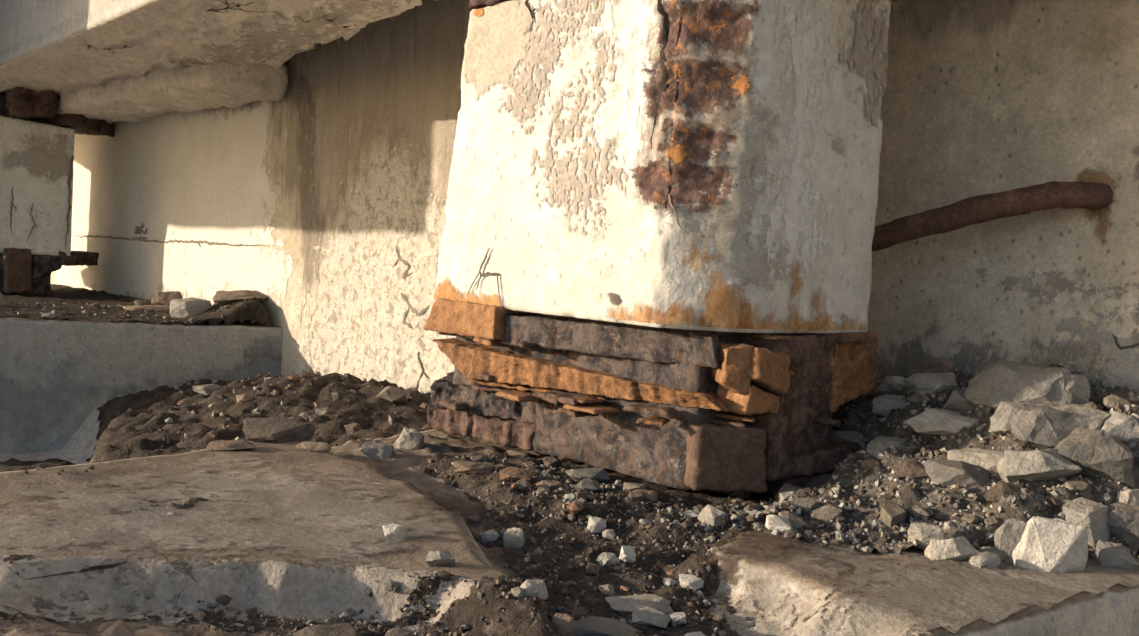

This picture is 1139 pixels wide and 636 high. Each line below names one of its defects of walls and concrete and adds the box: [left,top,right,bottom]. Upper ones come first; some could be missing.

peeling [461,0,628,241]
crack [650,0,670,149]
corrosion [629,0,759,213]
crack [10,187,38,240]
crack [65,155,278,248]
corrosion [1077,169,1119,244]
corrosion [606,243,868,344]
corrosion [473,337,541,349]
crack [1112,333,1139,350]
corrosion [439,400,469,411]
corrosion [477,373,677,426]
spalling [0,553,474,636]